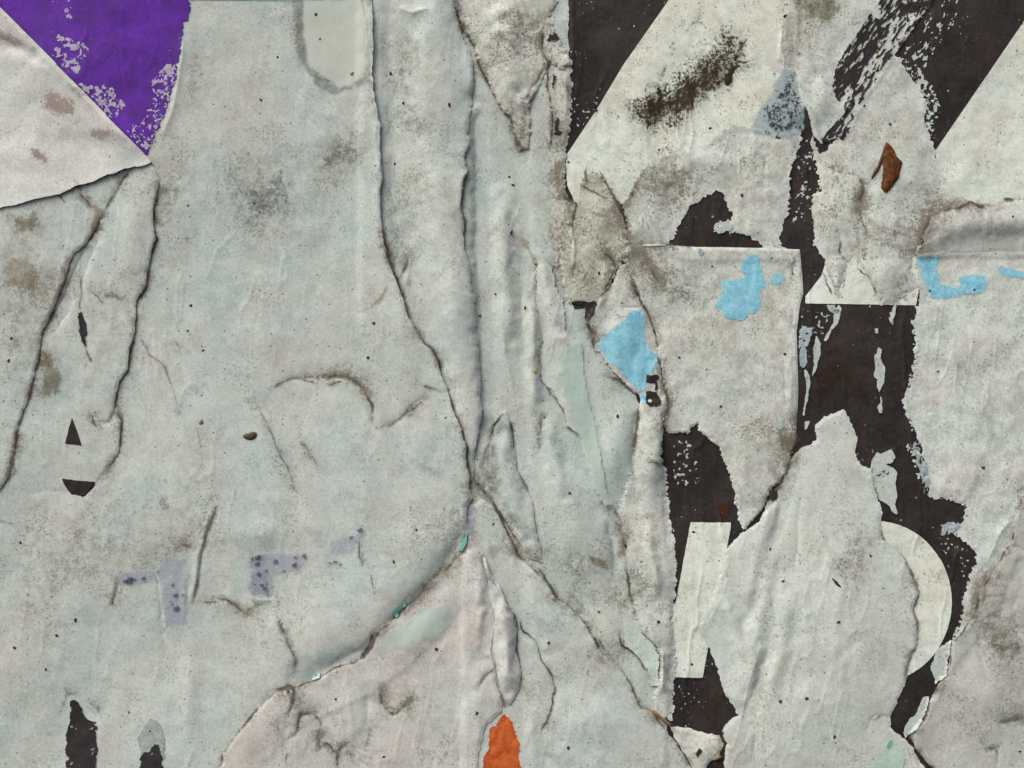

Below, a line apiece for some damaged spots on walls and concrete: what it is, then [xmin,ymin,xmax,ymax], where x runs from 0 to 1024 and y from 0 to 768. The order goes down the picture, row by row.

mould [622,21,749,133]
crack [460,144,470,240]
crack [563,170,644,226]
crack [128,192,158,365]
crack [0,171,129,493]
crack [274,237,680,749]
peeling [870,449,898,515]
peeling [913,443,929,487]
peeling [941,522,960,535]
crack [221,587,427,765]
peeling [903,696,929,738]
peeling [931,640,951,684]